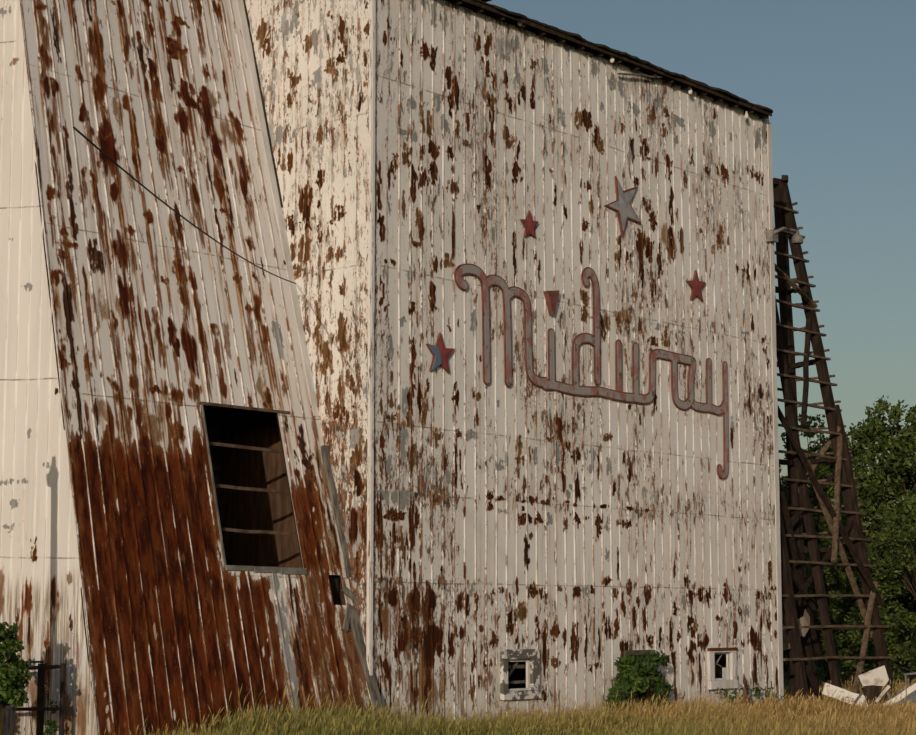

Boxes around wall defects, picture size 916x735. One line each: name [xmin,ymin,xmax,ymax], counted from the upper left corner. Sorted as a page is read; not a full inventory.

corrosion [15,578,33,658]
corrosion [34,0,372,735]
peeling [298,295,779,716]